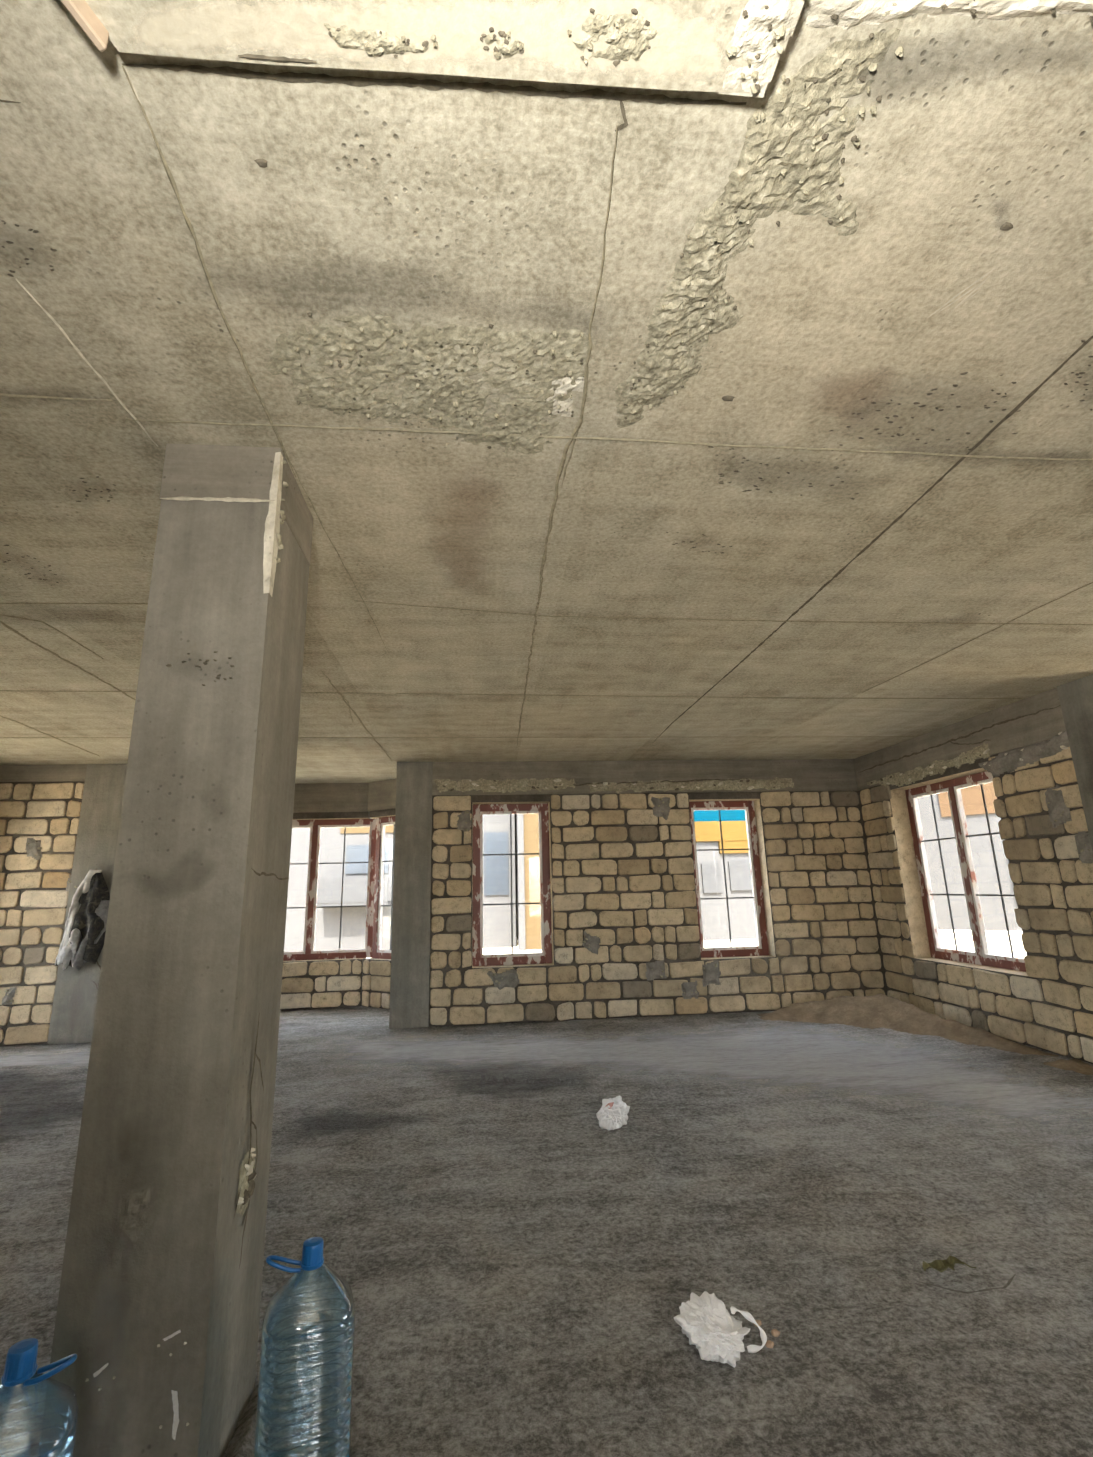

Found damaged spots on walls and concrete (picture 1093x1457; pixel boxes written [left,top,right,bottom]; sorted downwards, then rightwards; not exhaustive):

spalling [718,0,1093,224]
crack [122,54,747,759]
spalling [263,452,288,596]
crack [659,336,1093,736]
crack [0,715,99,756]
crack [0,614,136,700]